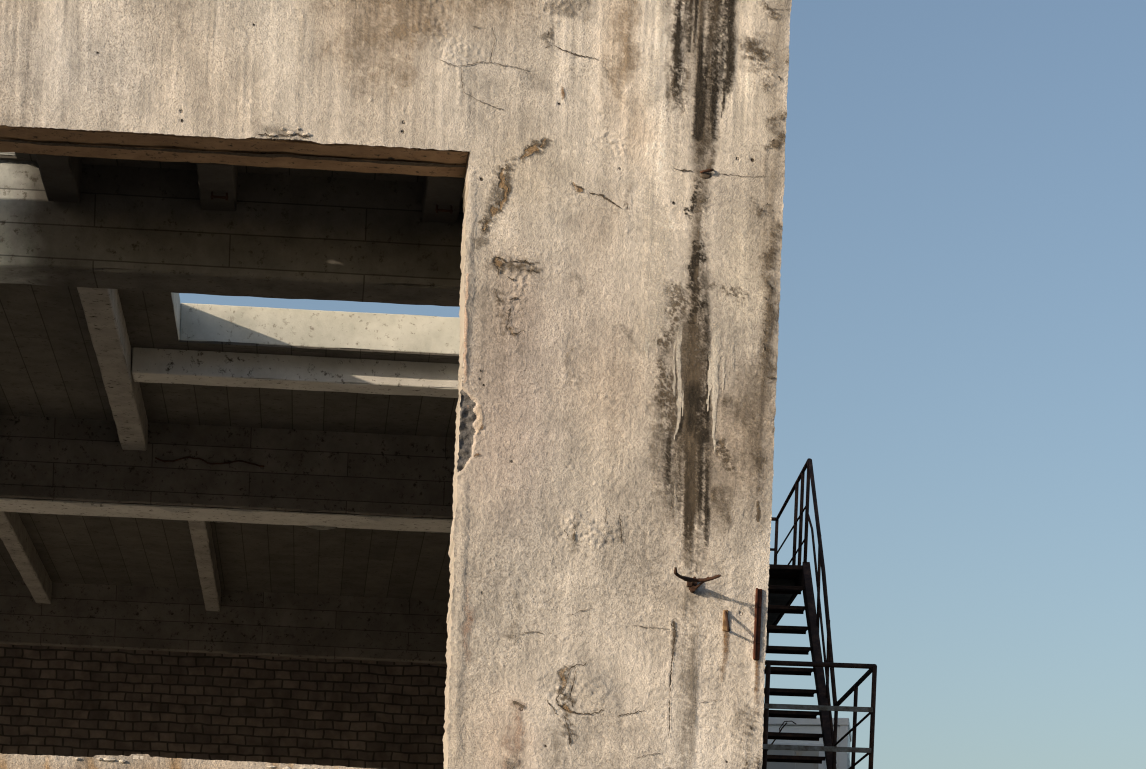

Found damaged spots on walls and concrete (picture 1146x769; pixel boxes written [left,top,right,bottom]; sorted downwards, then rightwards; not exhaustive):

crack [441,26,529,110]
crack [546,31,599,60]
damp [765,112,787,150]
damp [642,0,781,554]
spalling [457,278,482,472]